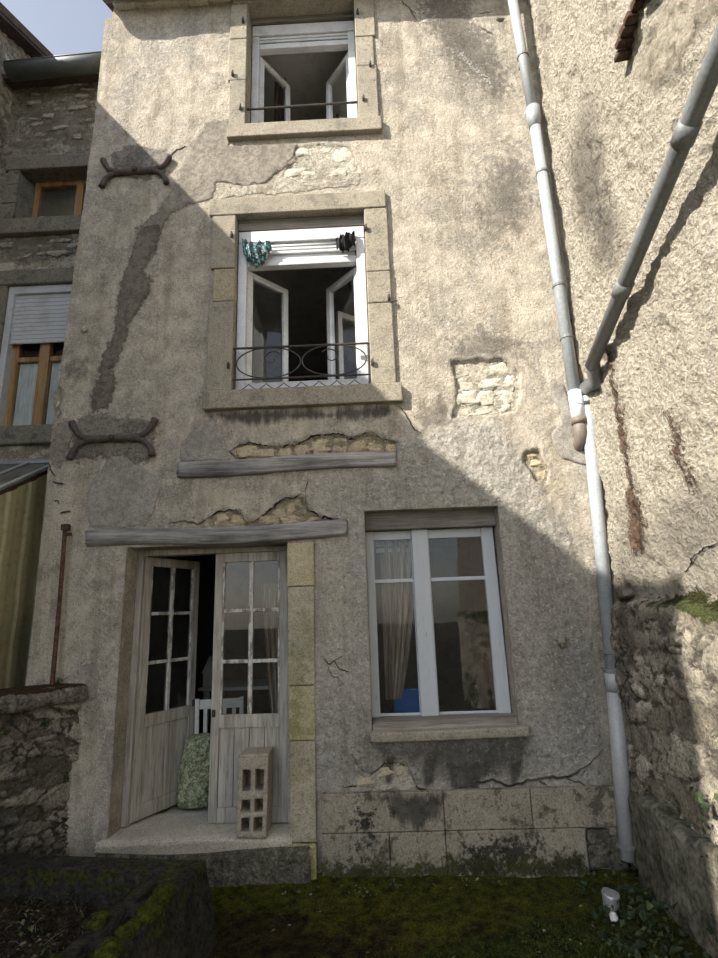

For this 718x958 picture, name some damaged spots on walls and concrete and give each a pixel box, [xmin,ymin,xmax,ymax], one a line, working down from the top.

flaking render [215,144,360,199]
flaking render [453,358,520,418]
flaking render [236,433,397,460]
corrosion [604,347,648,557]
crack [684,542,718,572]
crack [321,656,349,680]
flaking render [352,760,417,791]
damp [447,762,488,789]
crack [341,749,604,790]
damp [350,795,383,852]
damp [374,792,438,831]
mould [457,828,545,877]